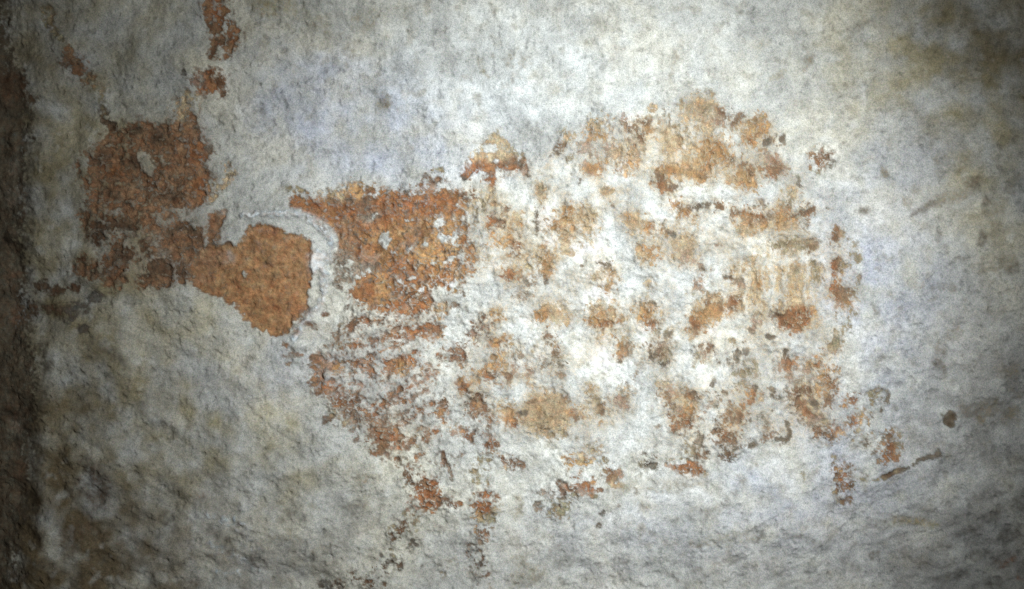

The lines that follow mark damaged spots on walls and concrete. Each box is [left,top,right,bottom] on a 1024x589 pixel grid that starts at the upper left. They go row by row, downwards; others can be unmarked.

rust [178,0,240,120]
rust [809,146,836,174]
flaking render [0,0,676,589]
rust [748,297,818,340]
rust [822,225,862,315]
rust [871,427,904,466]
rust [831,455,856,506]